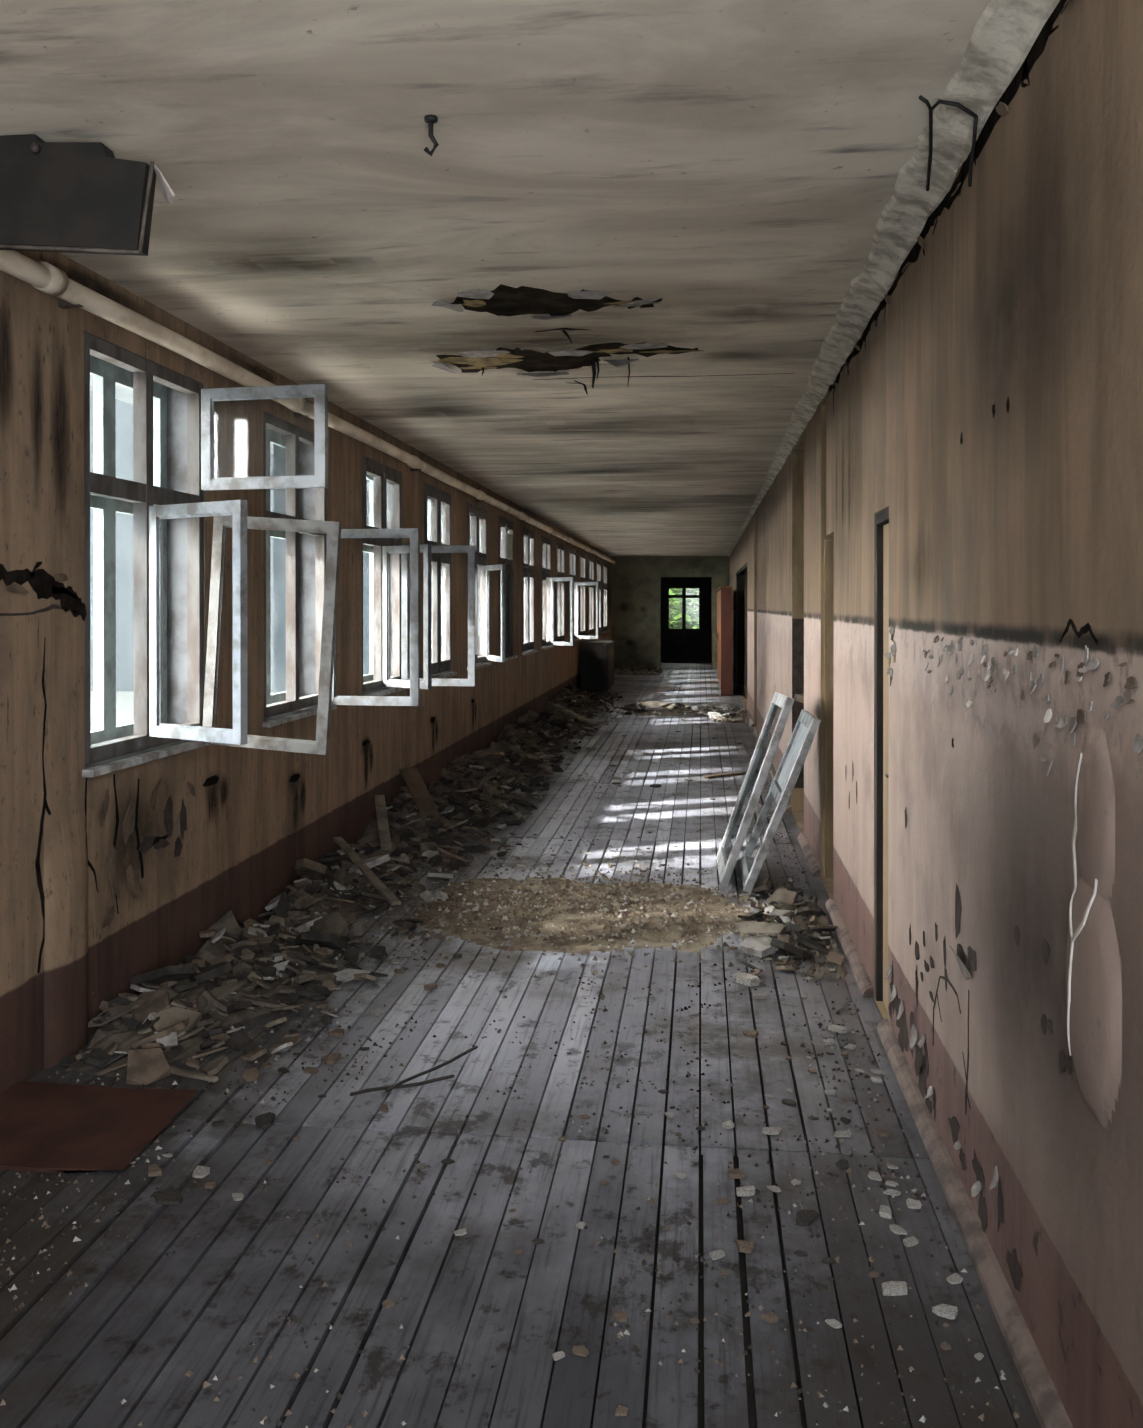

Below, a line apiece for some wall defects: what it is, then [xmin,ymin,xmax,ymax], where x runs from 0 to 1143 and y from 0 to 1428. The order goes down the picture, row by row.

spalling [432,284,729,388]
spalling [885,626,896,685]
peeling [885,883,1003,1233]
peeling [1007,1248,1023,1292]